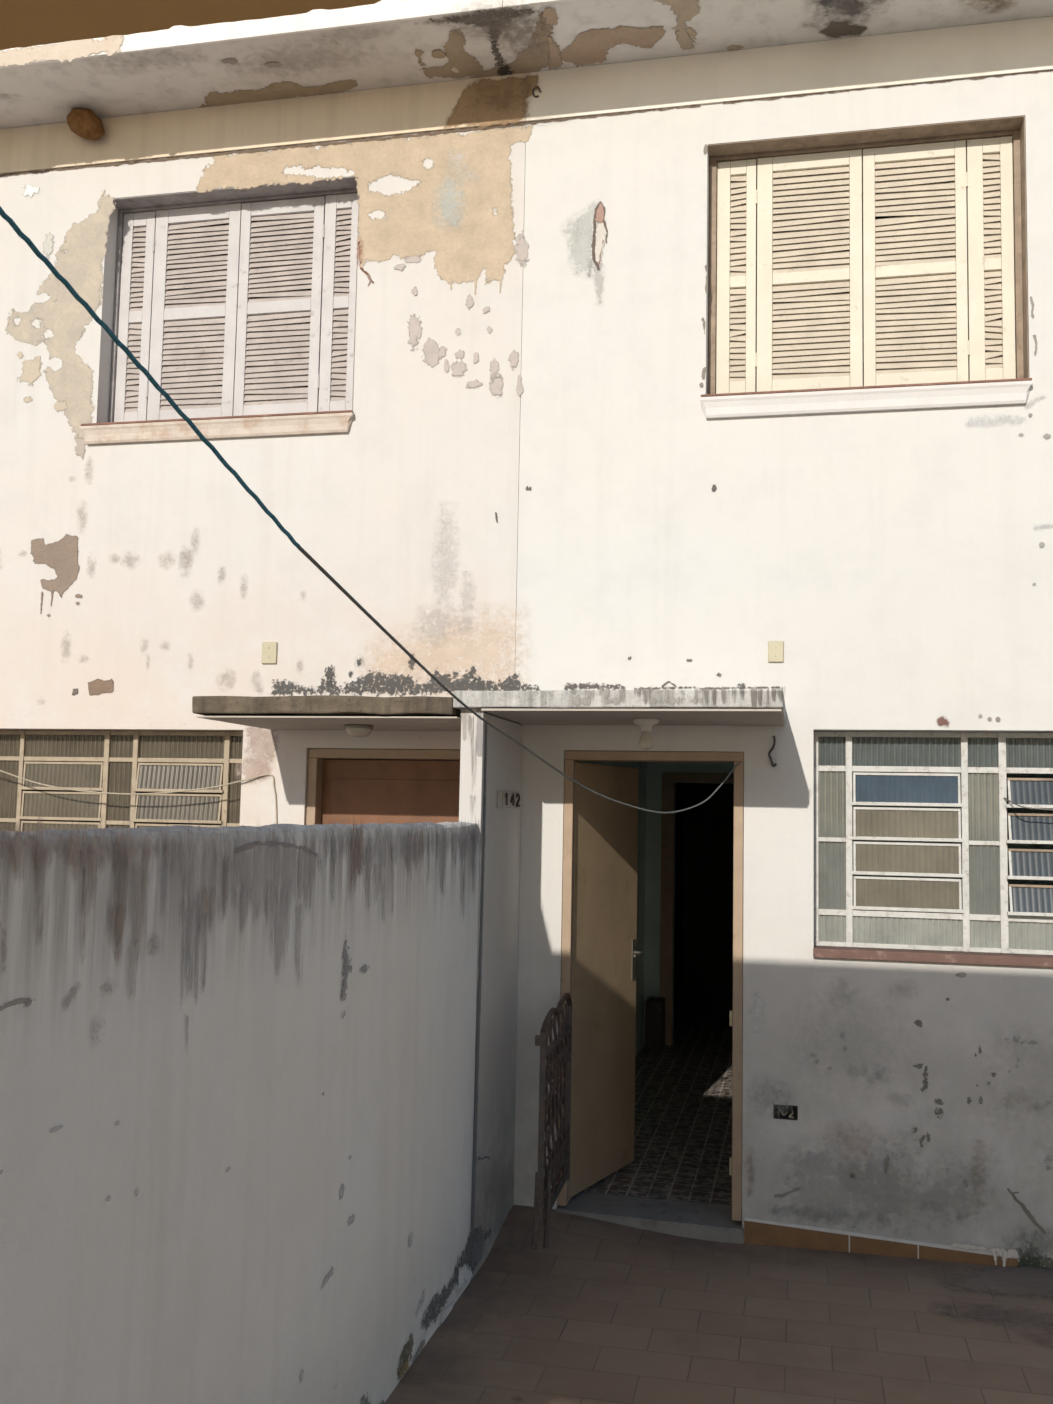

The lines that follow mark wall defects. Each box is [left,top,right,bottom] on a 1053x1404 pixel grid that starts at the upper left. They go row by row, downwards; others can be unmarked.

water stain [427,7,541,128]
peeling [415,0,701,79]
water stain [817,0,868,38]
peeling [196,124,533,334]
peeling [5,190,116,459]
peeling [408,314,523,397]
spalling [30,534,82,616]
spalling [72,679,114,696]
water stain [3,821,479,997]
water stain [341,940,370,1019]
water stain [913,1064,943,1118]
water stain [1016,1234,1053,1269]